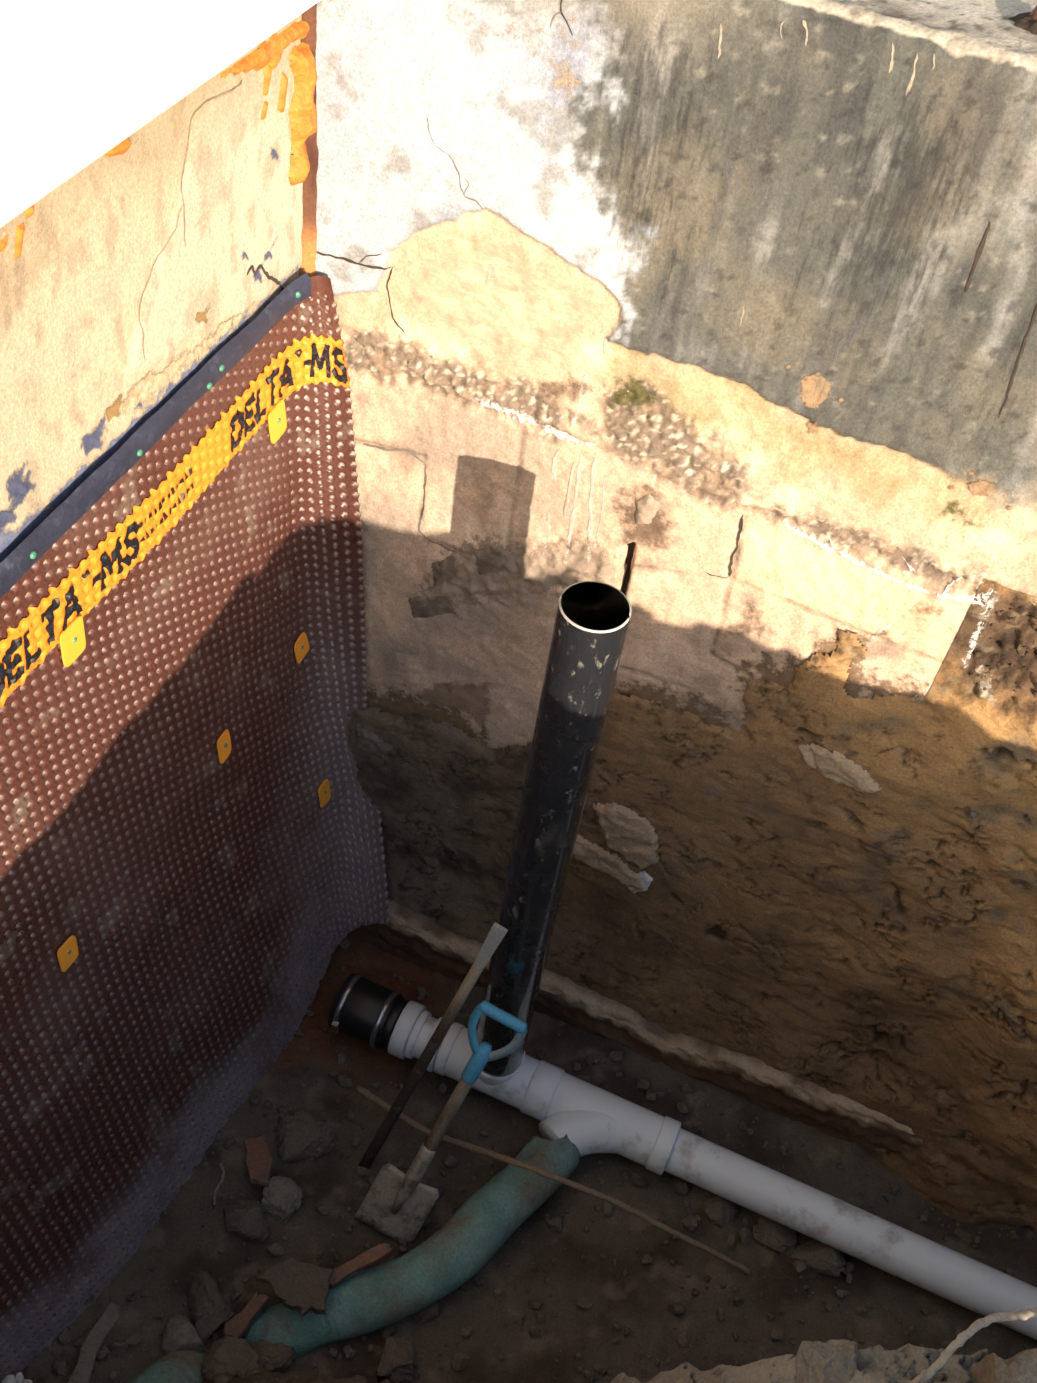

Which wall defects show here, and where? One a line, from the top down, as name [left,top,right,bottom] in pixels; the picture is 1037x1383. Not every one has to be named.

crack [139,81,242,361]
crack [317,251,405,333]
crack [965,222,990,293]
spalling [784,365,844,434]
crack [998,306,1037,419]
spalling [949,472,997,496]
flaking render [408,532,621,618]
crack [706,515,743,578]